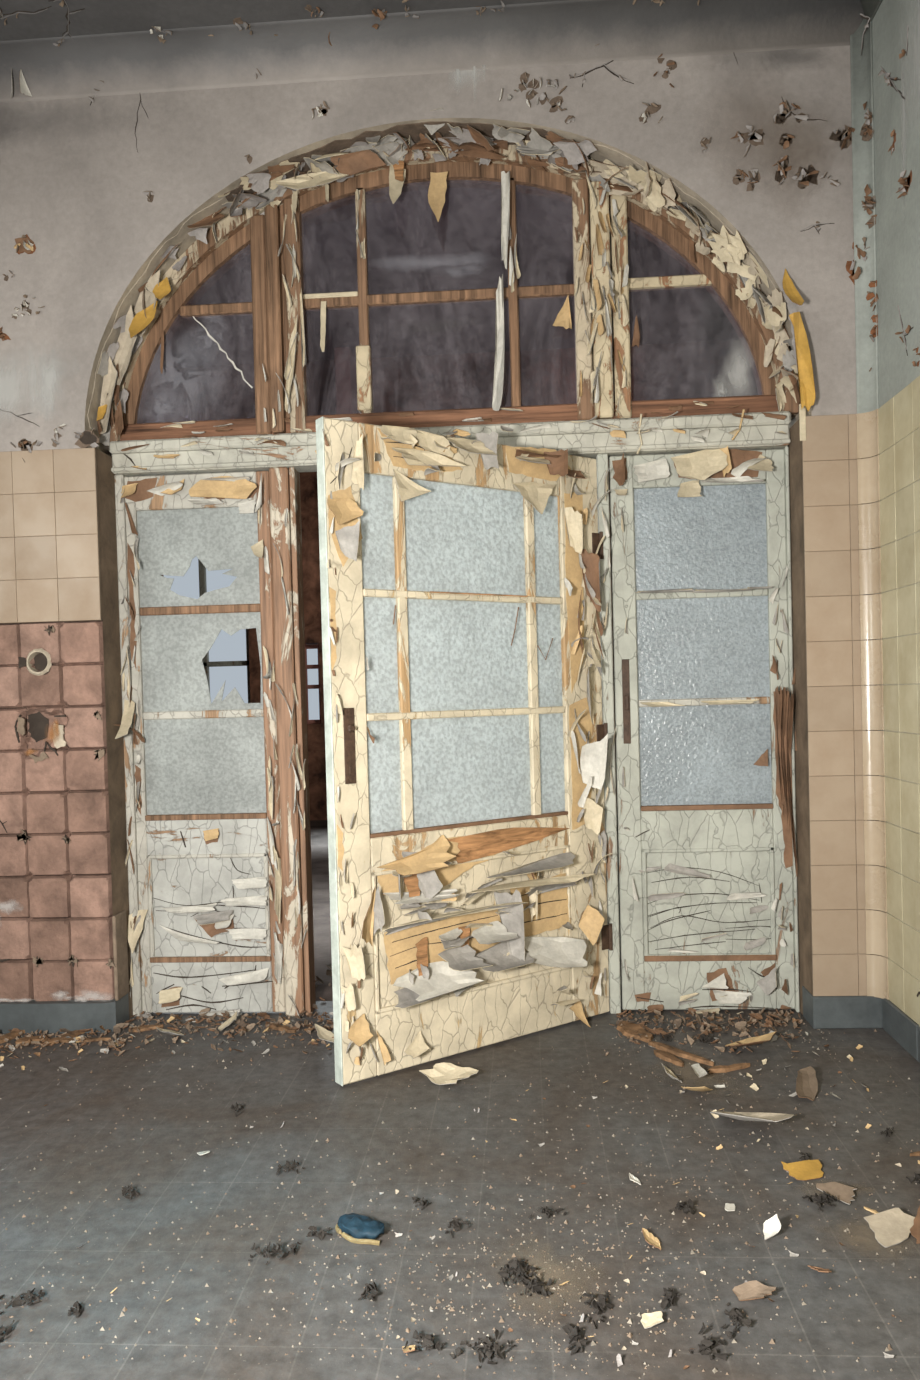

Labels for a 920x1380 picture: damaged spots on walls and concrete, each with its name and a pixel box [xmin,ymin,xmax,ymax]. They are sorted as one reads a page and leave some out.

peeling [150,26,172,44]
peeling [730,96,896,191]
peeling [896,170,912,199]
peeling [846,184,879,342]
spalling [0,68,816,1065]